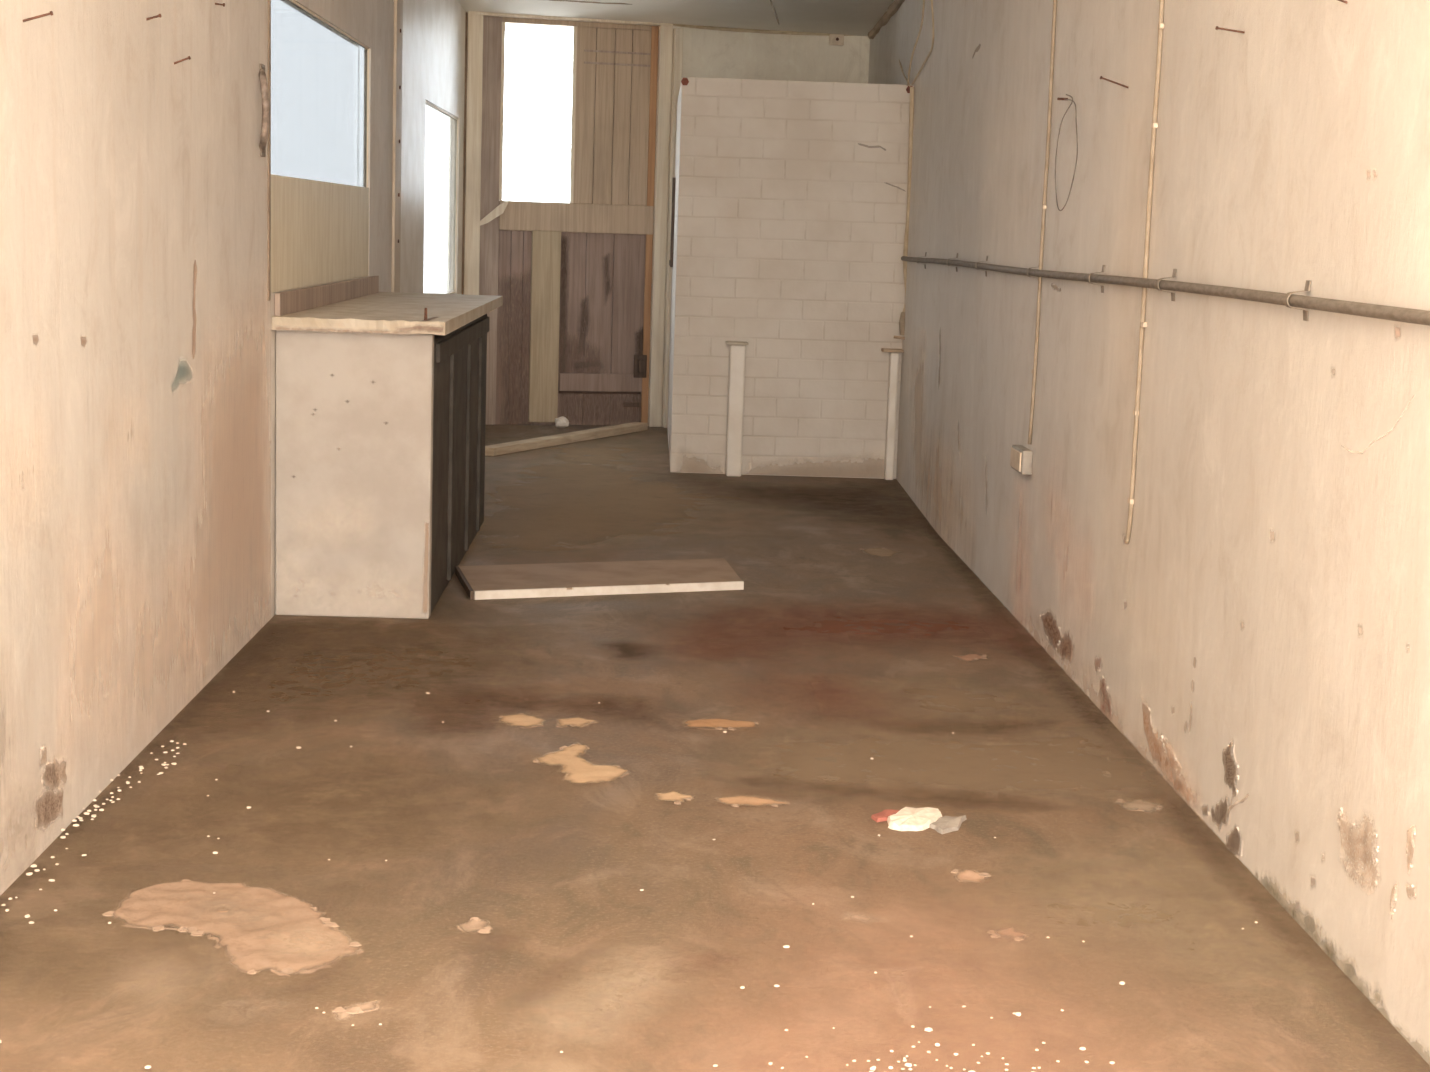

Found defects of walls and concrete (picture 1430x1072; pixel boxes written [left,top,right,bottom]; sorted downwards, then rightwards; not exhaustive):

spalling [1039,610,1073,663]
spalling [1116,799,1165,814]
spalling [1142,704,1244,858]
peeling [1336,808,1414,914]
peeling [1405,828,1416,868]